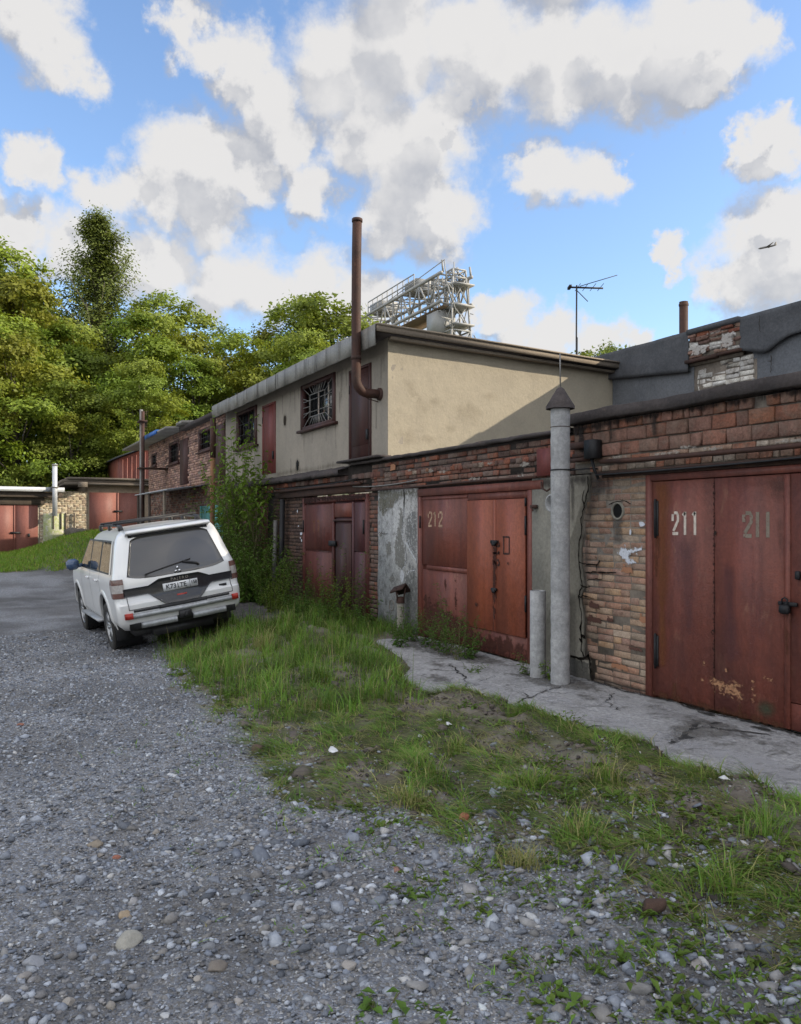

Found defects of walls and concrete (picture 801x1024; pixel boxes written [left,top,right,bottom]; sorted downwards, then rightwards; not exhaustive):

peeling [691,331,733,355]
water stain [378,489,416,514]
peeling [617,522,645,573]
corrosion [423,580,527,663]
corrosion [492,546,509,619]
crack [515,476,631,737]
peeling [701,483,755,701]
crack [435,663,492,686]
water stain [588,678,801,736]